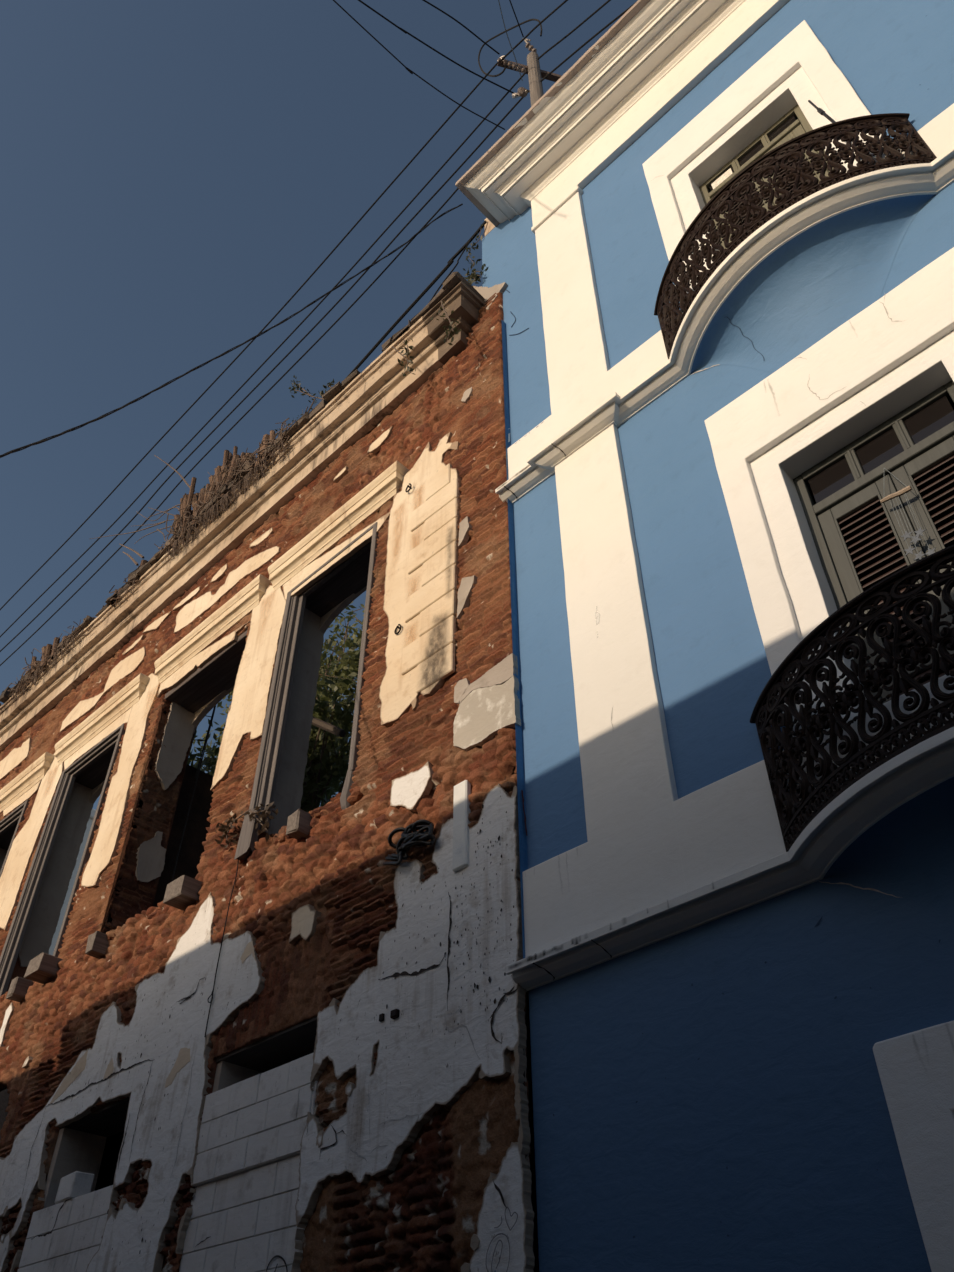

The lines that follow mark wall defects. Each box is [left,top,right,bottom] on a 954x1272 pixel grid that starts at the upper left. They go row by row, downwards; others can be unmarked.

peeling [367,426,394,454]
peeling [60,528,281,733]
peeling [453,676,521,751]
peeling [0,738,33,781]
peeling [154,702,195,790]
peeling [390,761,434,812]
peeling [135,831,166,883]
peeling [289,904,322,945]
peeling [0,1002,15,1047]
spalling [112,1159,152,1211]
spalling [300,1051,520,1272]
spalling [0,1189,45,1272]